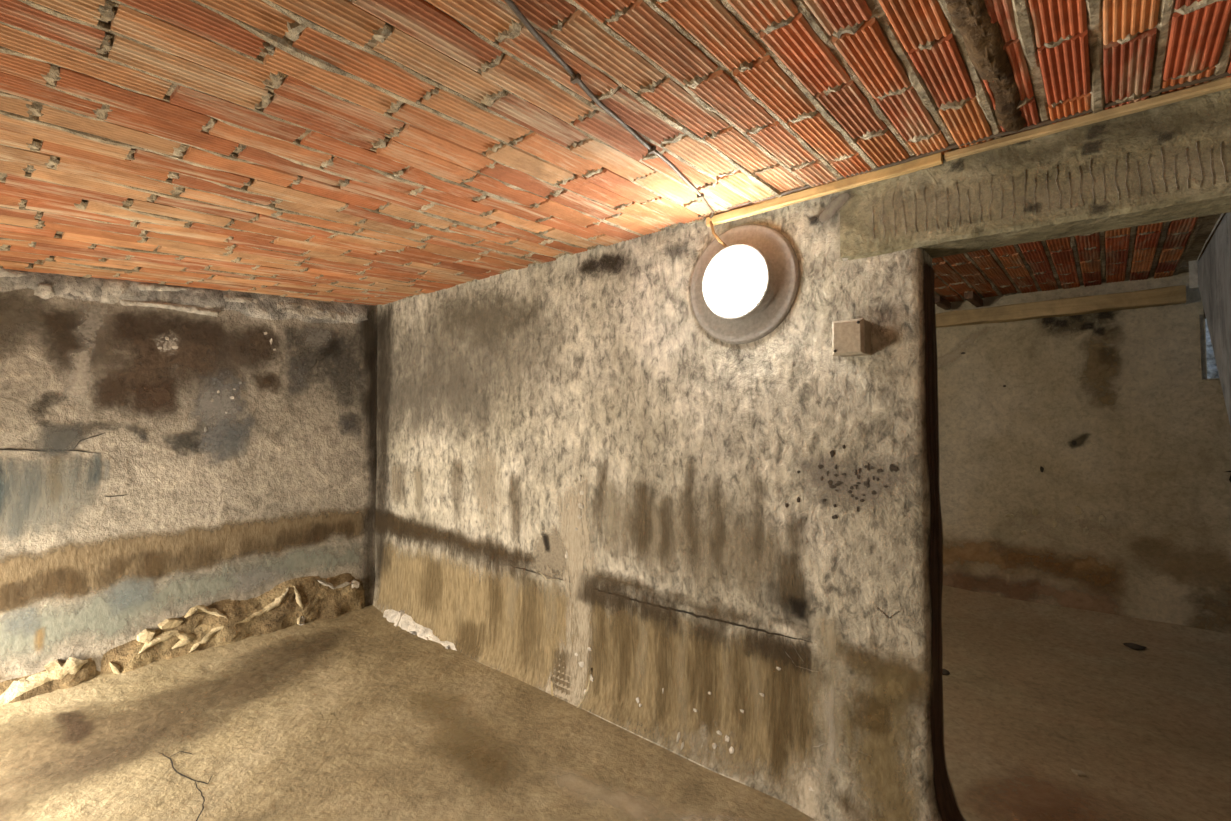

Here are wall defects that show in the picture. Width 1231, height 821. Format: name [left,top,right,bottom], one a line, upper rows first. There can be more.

spalling [0,573,365,705]
damp [0,293,923,821]
damp [943,571,1120,615]
crack [156,751,213,821]